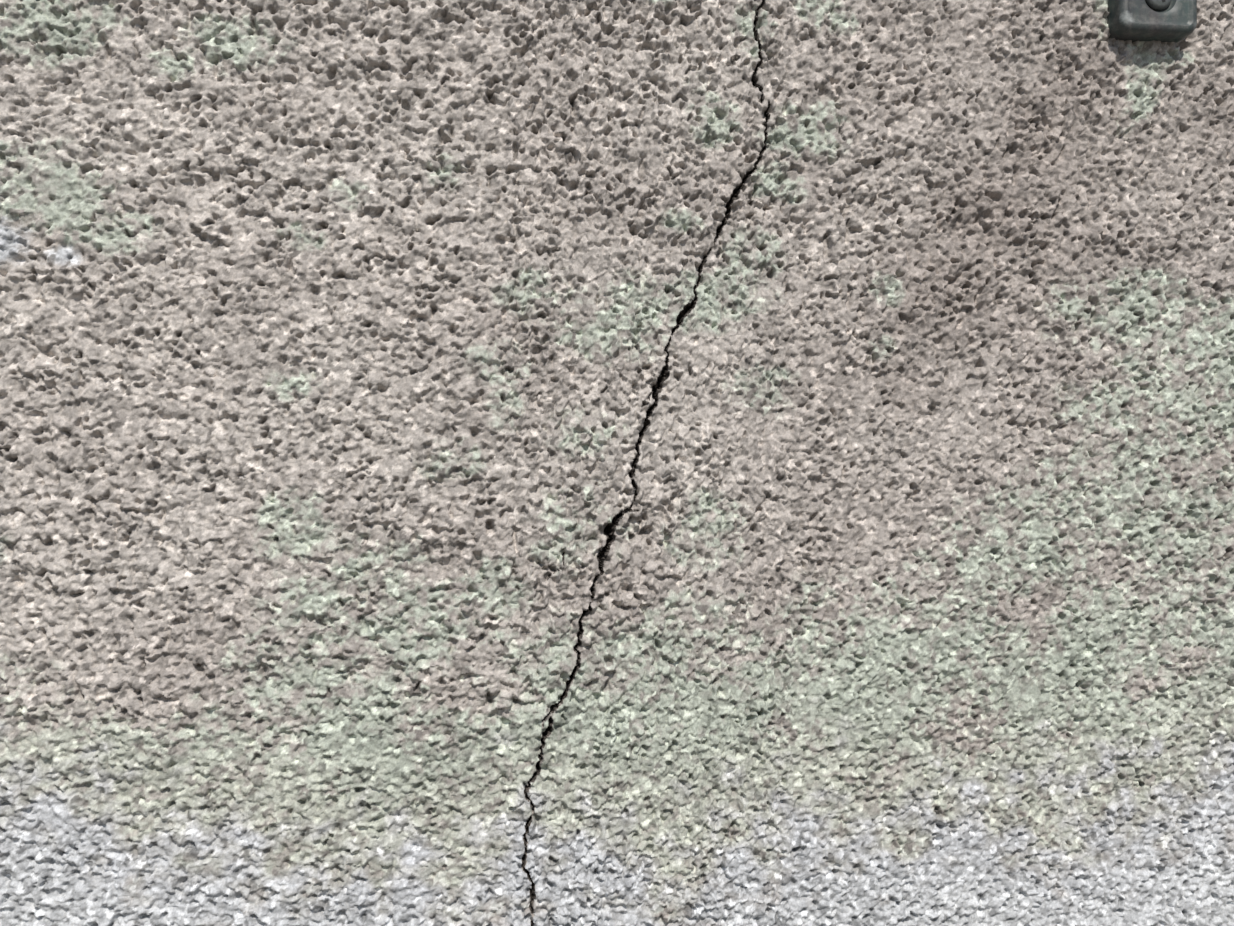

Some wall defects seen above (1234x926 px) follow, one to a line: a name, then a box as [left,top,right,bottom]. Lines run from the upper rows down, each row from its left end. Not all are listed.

crack [521,0,770,926]